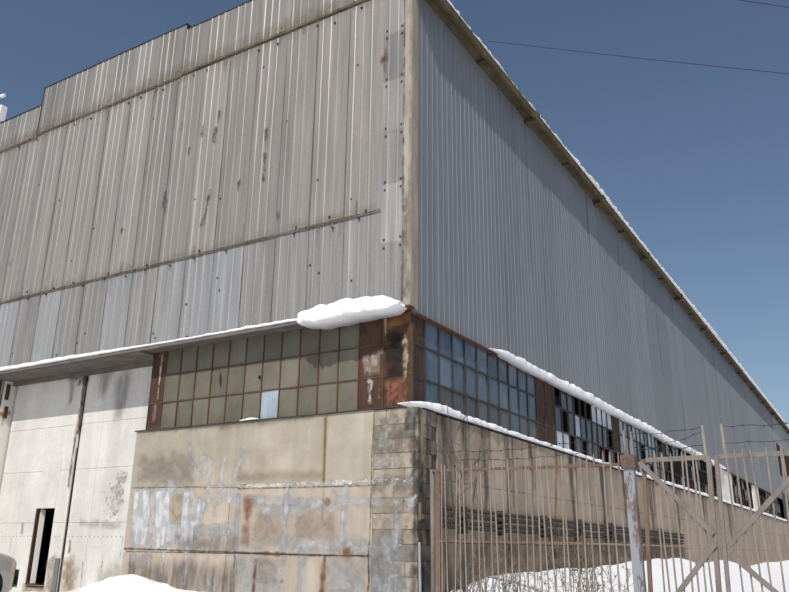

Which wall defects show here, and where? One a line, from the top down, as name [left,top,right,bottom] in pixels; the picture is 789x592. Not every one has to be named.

peeling [363,313,410,406]
leakage [129,566,195,589]